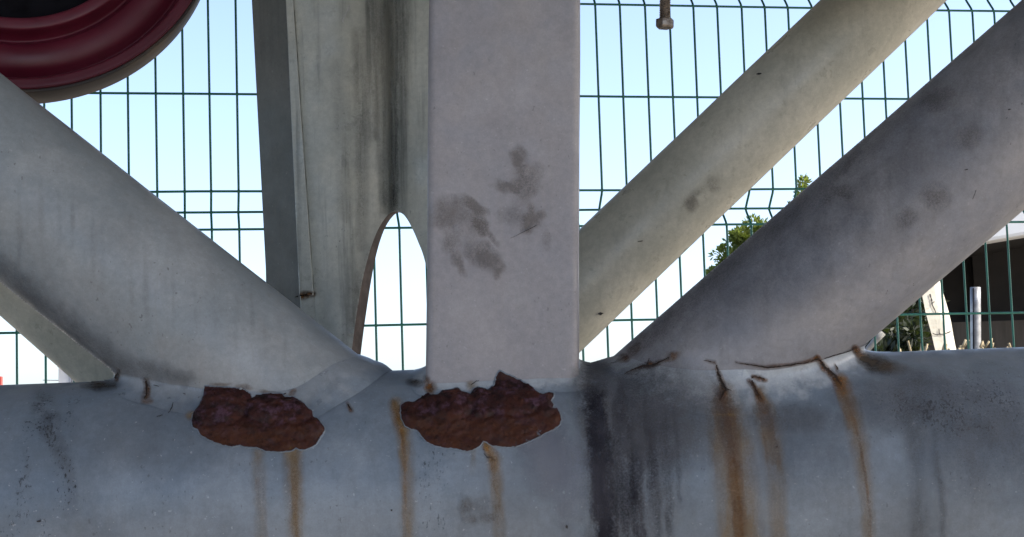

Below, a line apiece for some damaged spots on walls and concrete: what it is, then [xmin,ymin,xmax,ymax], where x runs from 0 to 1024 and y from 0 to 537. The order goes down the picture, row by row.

crack [624,353,676,374]
crack [704,347,857,401]
water stain [585,363,656,537]